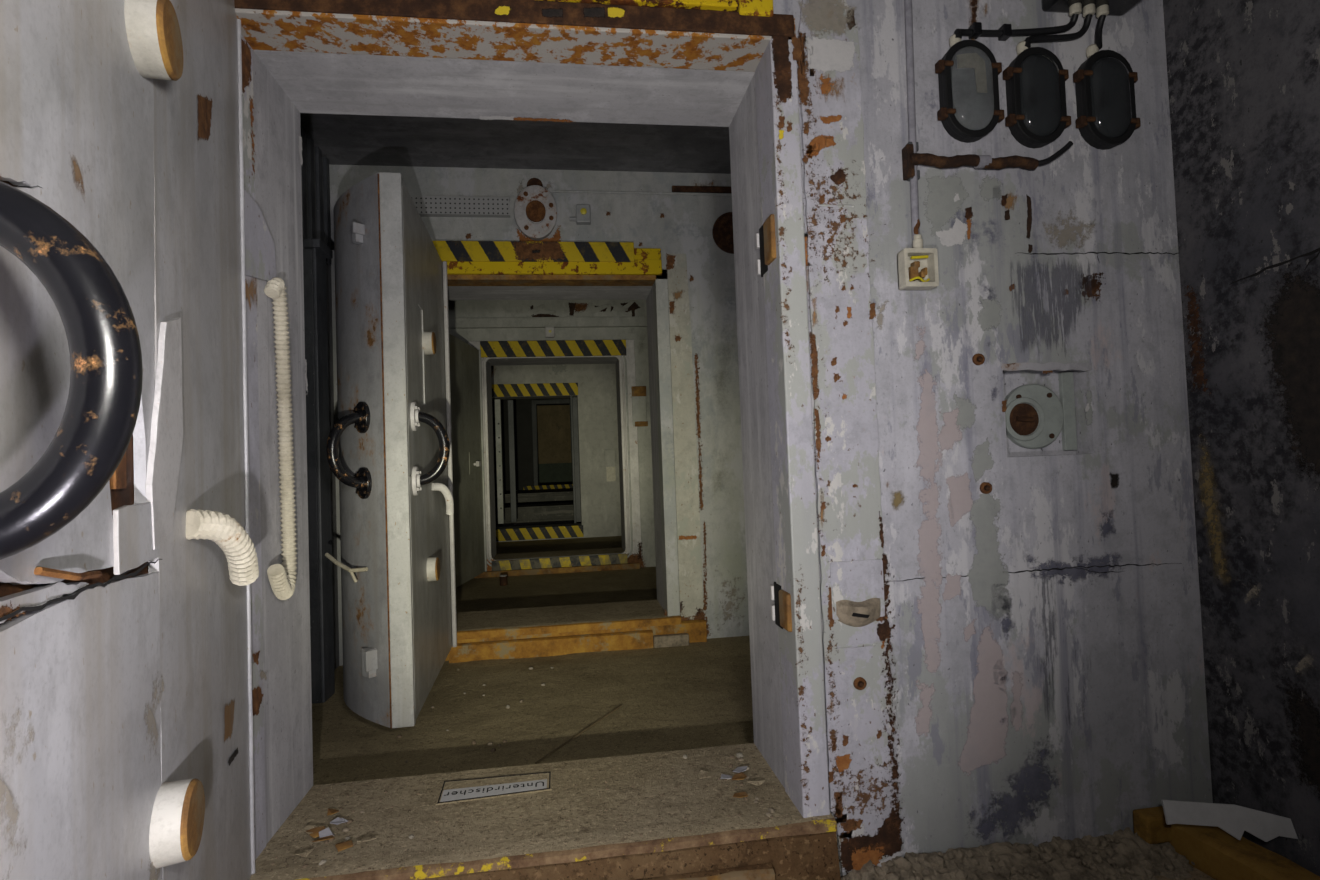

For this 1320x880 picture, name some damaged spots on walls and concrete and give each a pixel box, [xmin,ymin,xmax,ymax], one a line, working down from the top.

peeling [828,167,846,185]
peeling [869,301,887,327]
corrosion [771,30,905,874]
leakage [1109,473,1120,488]
peeling [942,438,1024,775]
leakage [994,584,1012,636]
leakage [1027,554,1120,711]
leakage [970,749,1058,840]
peeling [873,851,903,867]